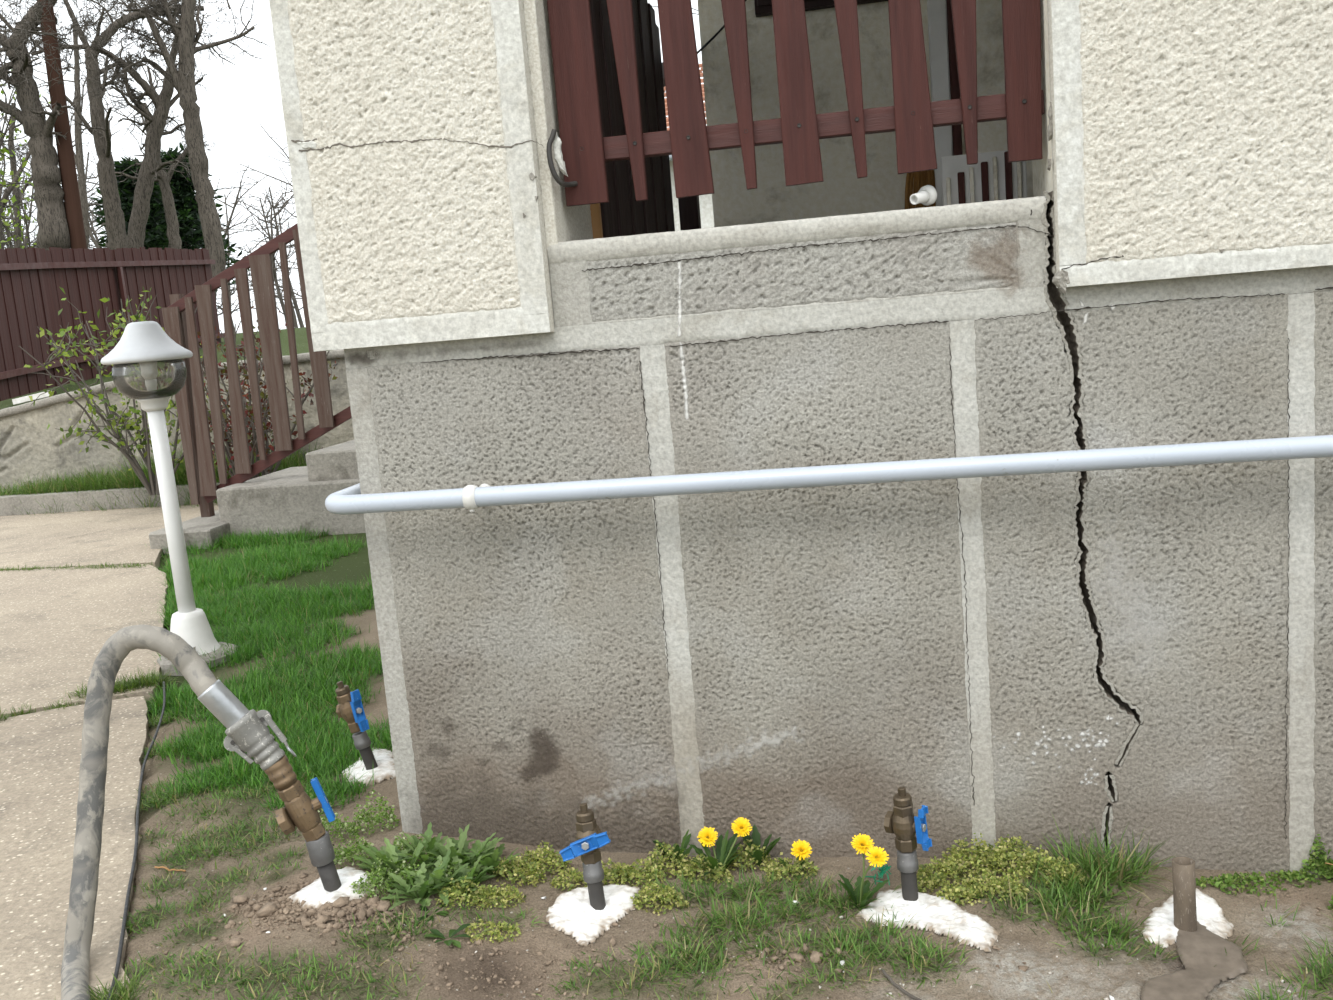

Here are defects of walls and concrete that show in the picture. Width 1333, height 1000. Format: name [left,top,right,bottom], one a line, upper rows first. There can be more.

leakage [523,730,557,778]
crack [420,191,1333,852]